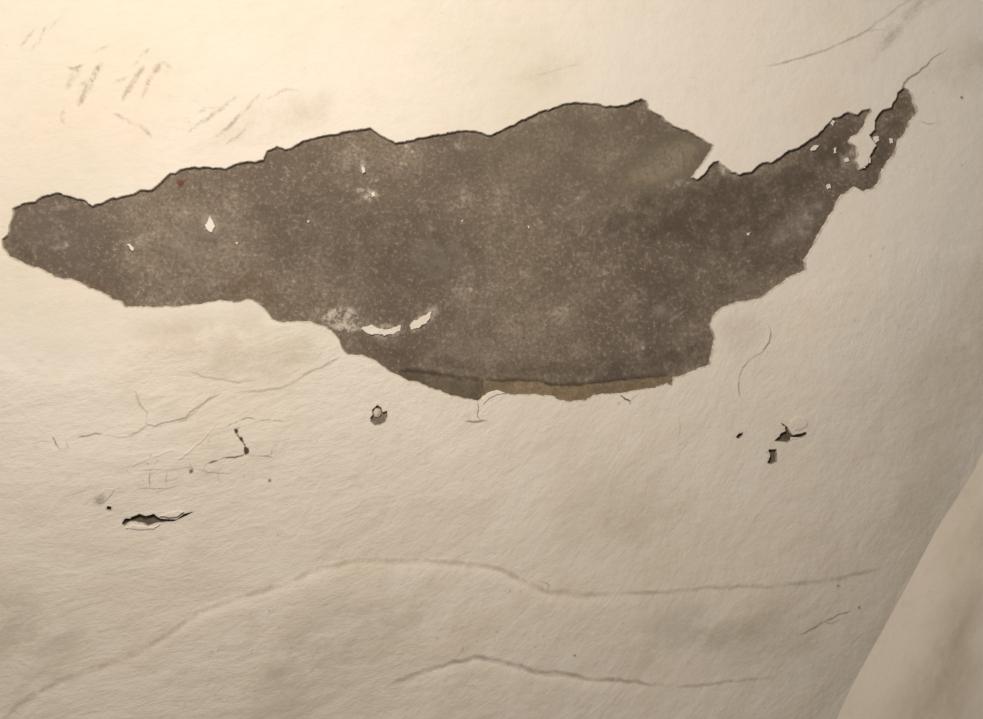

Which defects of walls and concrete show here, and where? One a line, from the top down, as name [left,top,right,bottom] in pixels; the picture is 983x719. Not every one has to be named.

flaking render [1,87,919,404]
peeling [370,405,388,426]
peeling [766,416,808,464]
peeling [96,488,115,511]
peeling [121,510,194,530]